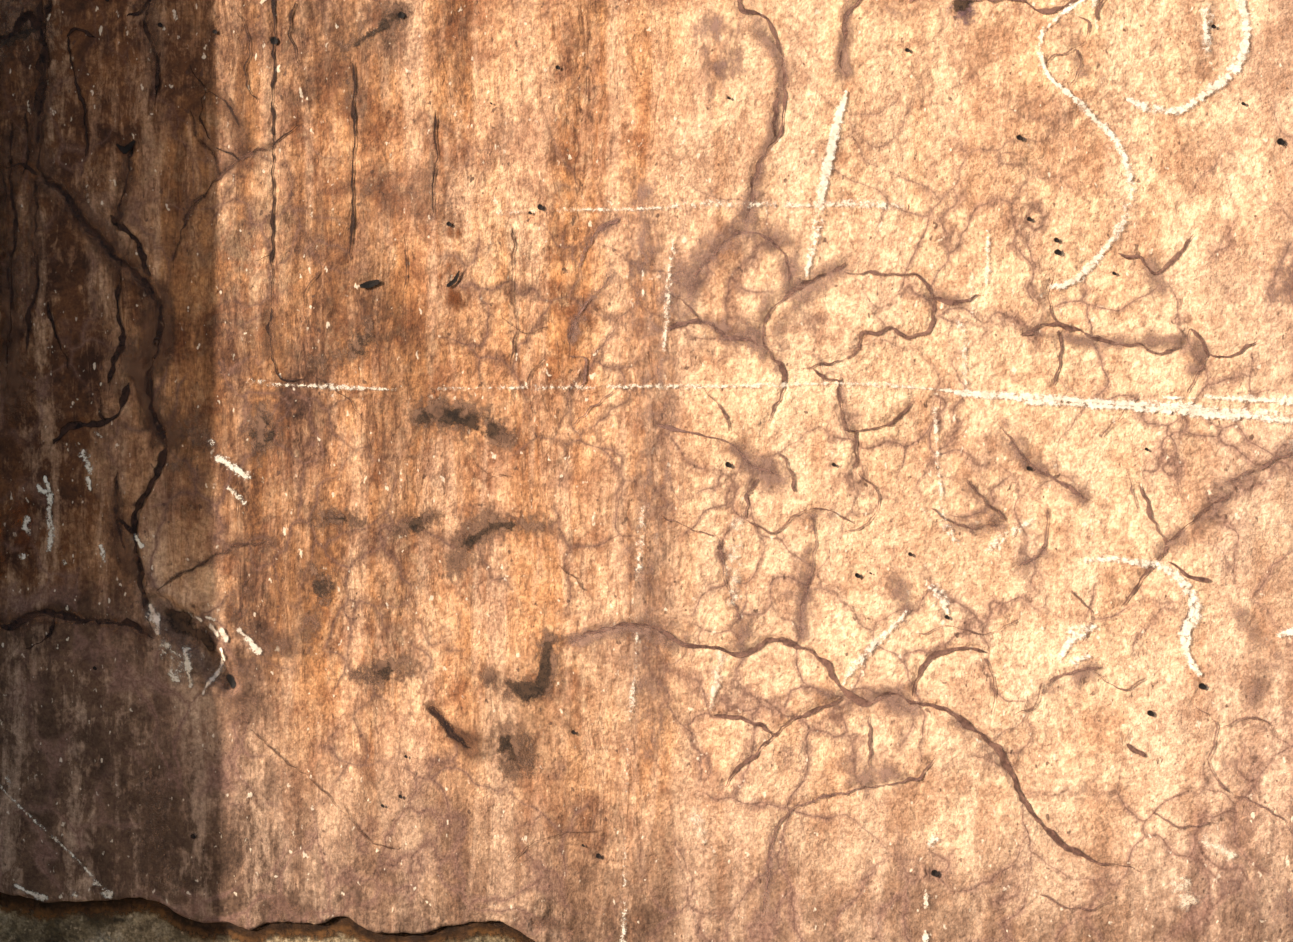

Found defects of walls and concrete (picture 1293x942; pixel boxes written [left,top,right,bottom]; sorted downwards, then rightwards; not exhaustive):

crack [431,113,439,213]
crack [0,0,370,650]
crack [401,230,409,340]
crack [504,218,619,423]
crack [1020,276,1256,395]
crack [1118,234,1194,292]
crack [568,0,1146,913]
crack [1123,447,1293,631]
crack [426,701,491,758]
crack [1196,608,1293,834]
crack [1154,813,1214,829]